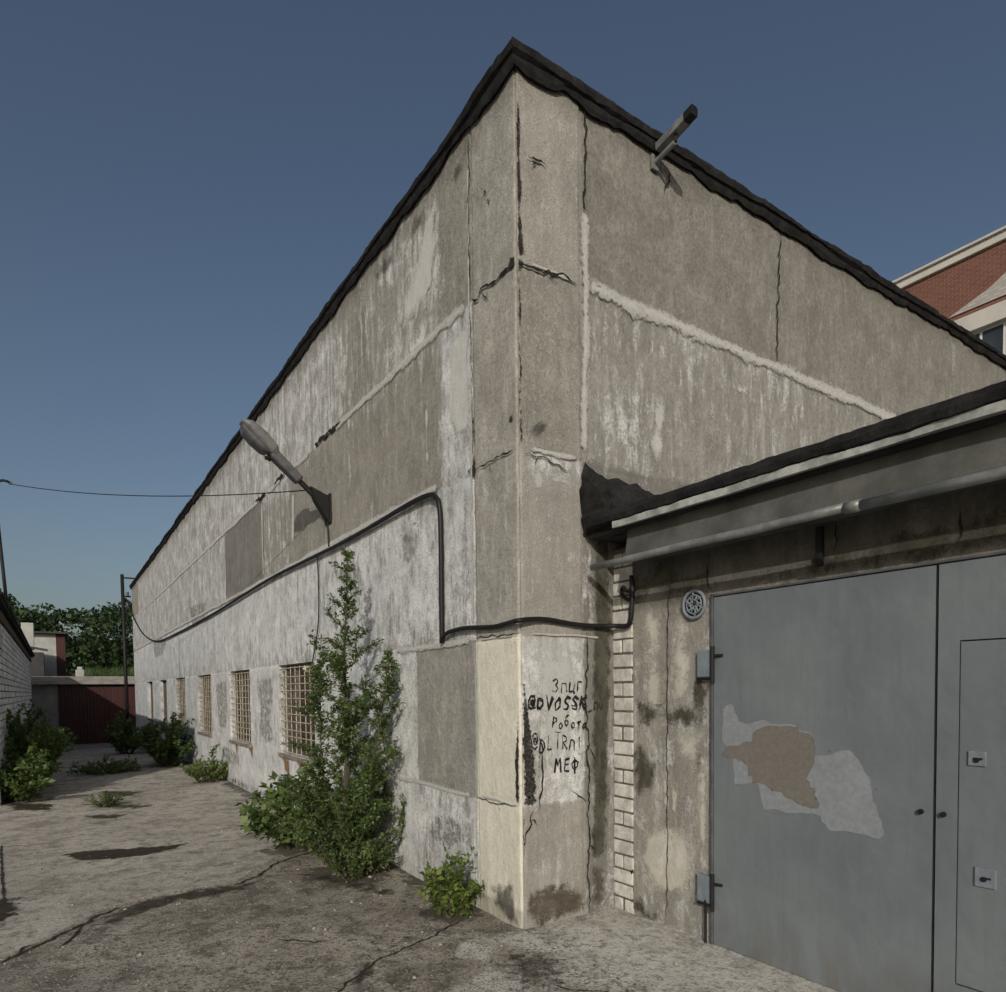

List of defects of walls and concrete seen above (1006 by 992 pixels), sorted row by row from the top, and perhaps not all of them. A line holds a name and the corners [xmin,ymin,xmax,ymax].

crack [468,138,585,472]
crack [775,236,783,359]
water stain [861,509,1006,568]
water stain [591,541,611,903]
crack [657,578,674,911]
water stain [634,610,709,896]
peeling [721,703,884,839]
water stain [497,885,515,920]
water stain [529,884,583,926]